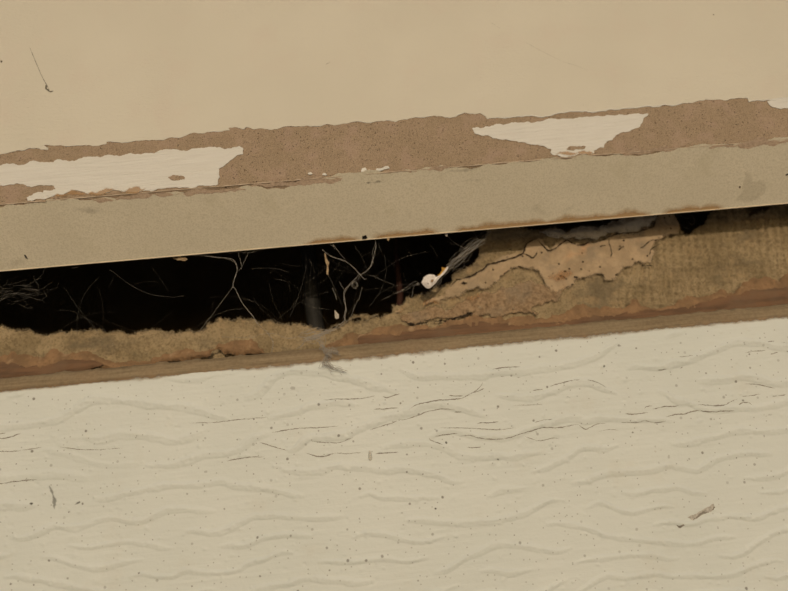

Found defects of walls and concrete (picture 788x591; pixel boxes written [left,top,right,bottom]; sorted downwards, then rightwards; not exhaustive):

peeling [0,97,788,204]
spalling [520,218,622,233]
spalling [674,210,715,235]
spalling [0,246,307,336]
spalling [315,230,487,330]
peeling [0,304,788,392]